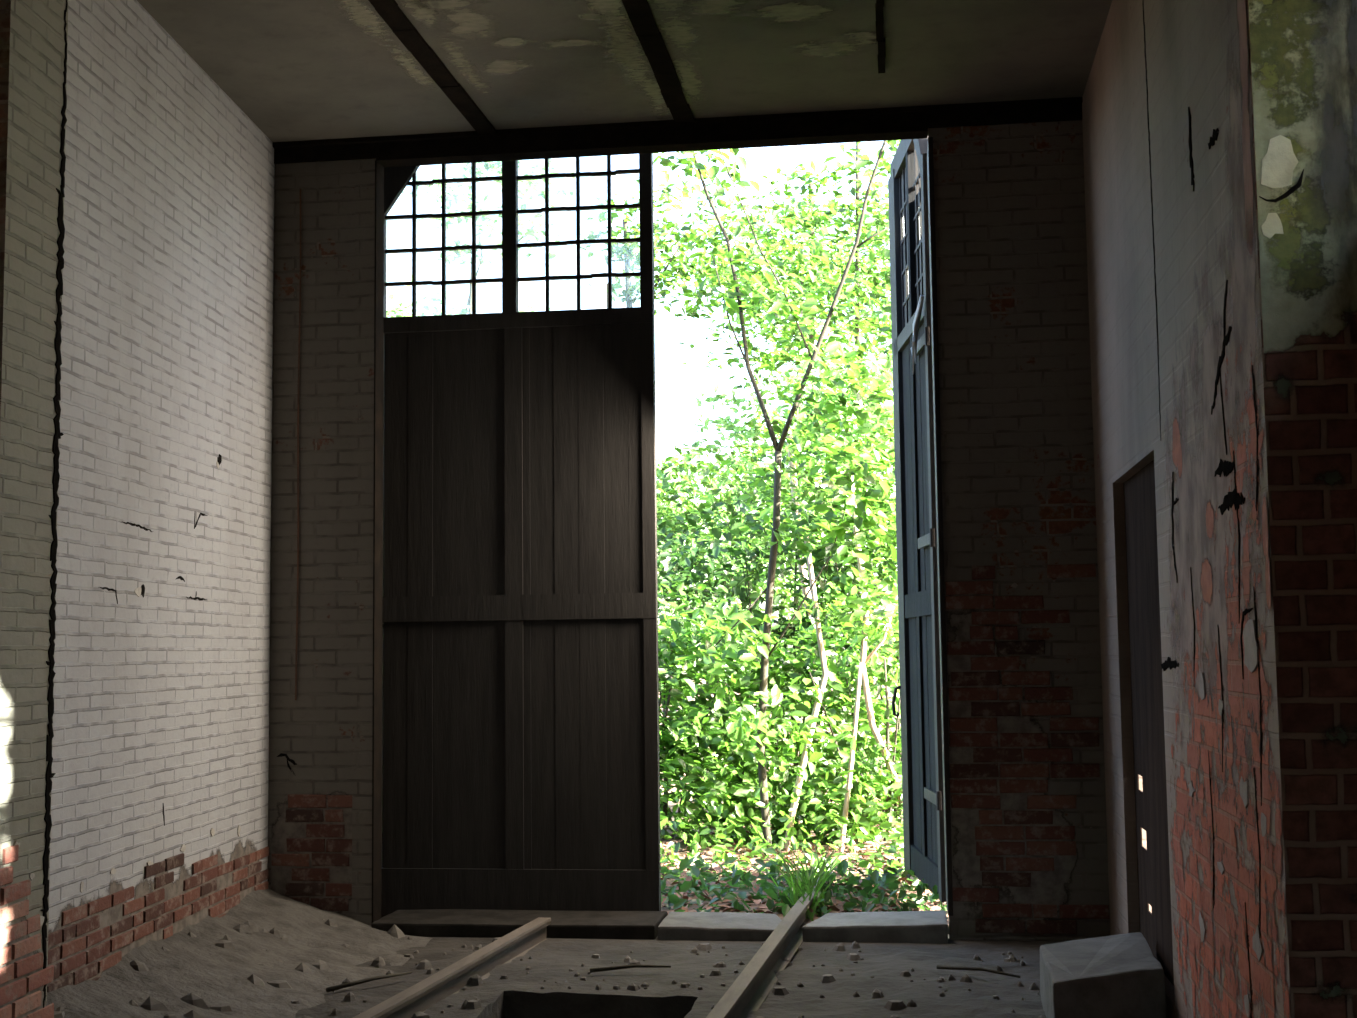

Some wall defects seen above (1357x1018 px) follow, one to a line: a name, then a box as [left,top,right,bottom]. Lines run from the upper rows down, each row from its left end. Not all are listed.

crack [1142,0,1161,441]
crack [1188,107,1219,192]
damp [1314,0,1357,225]
crack [40,0,68,1008]
crack [1161,280,1263,1018]
peeling [0,791,352,1018]